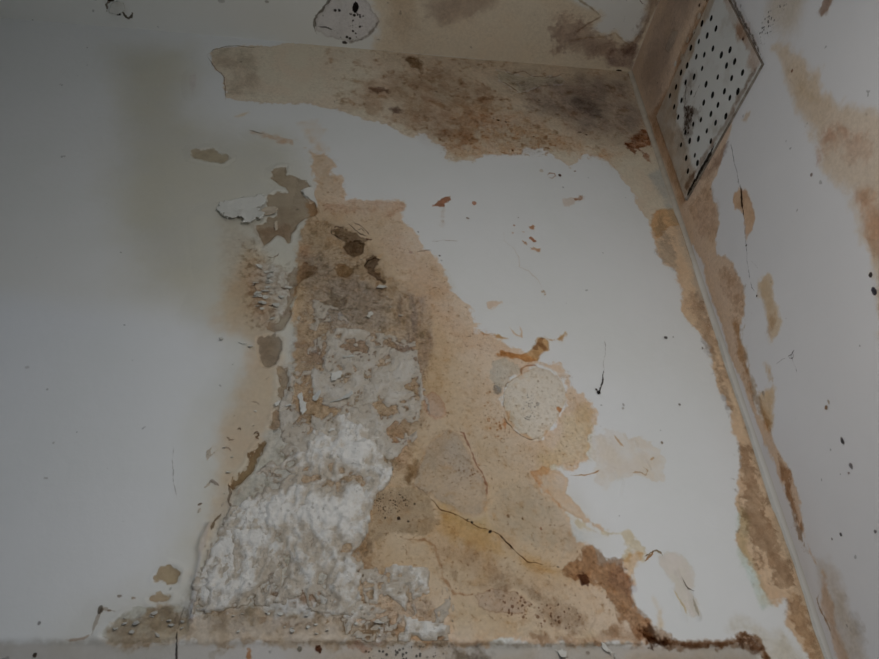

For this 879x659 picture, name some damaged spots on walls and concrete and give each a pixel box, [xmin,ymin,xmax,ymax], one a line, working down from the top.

peeling [216,194,278,231]
peeling [297,390,321,415]
leakage [191,299,455,659]
crack [438,507,536,563]
leakage [643,624,668,650]